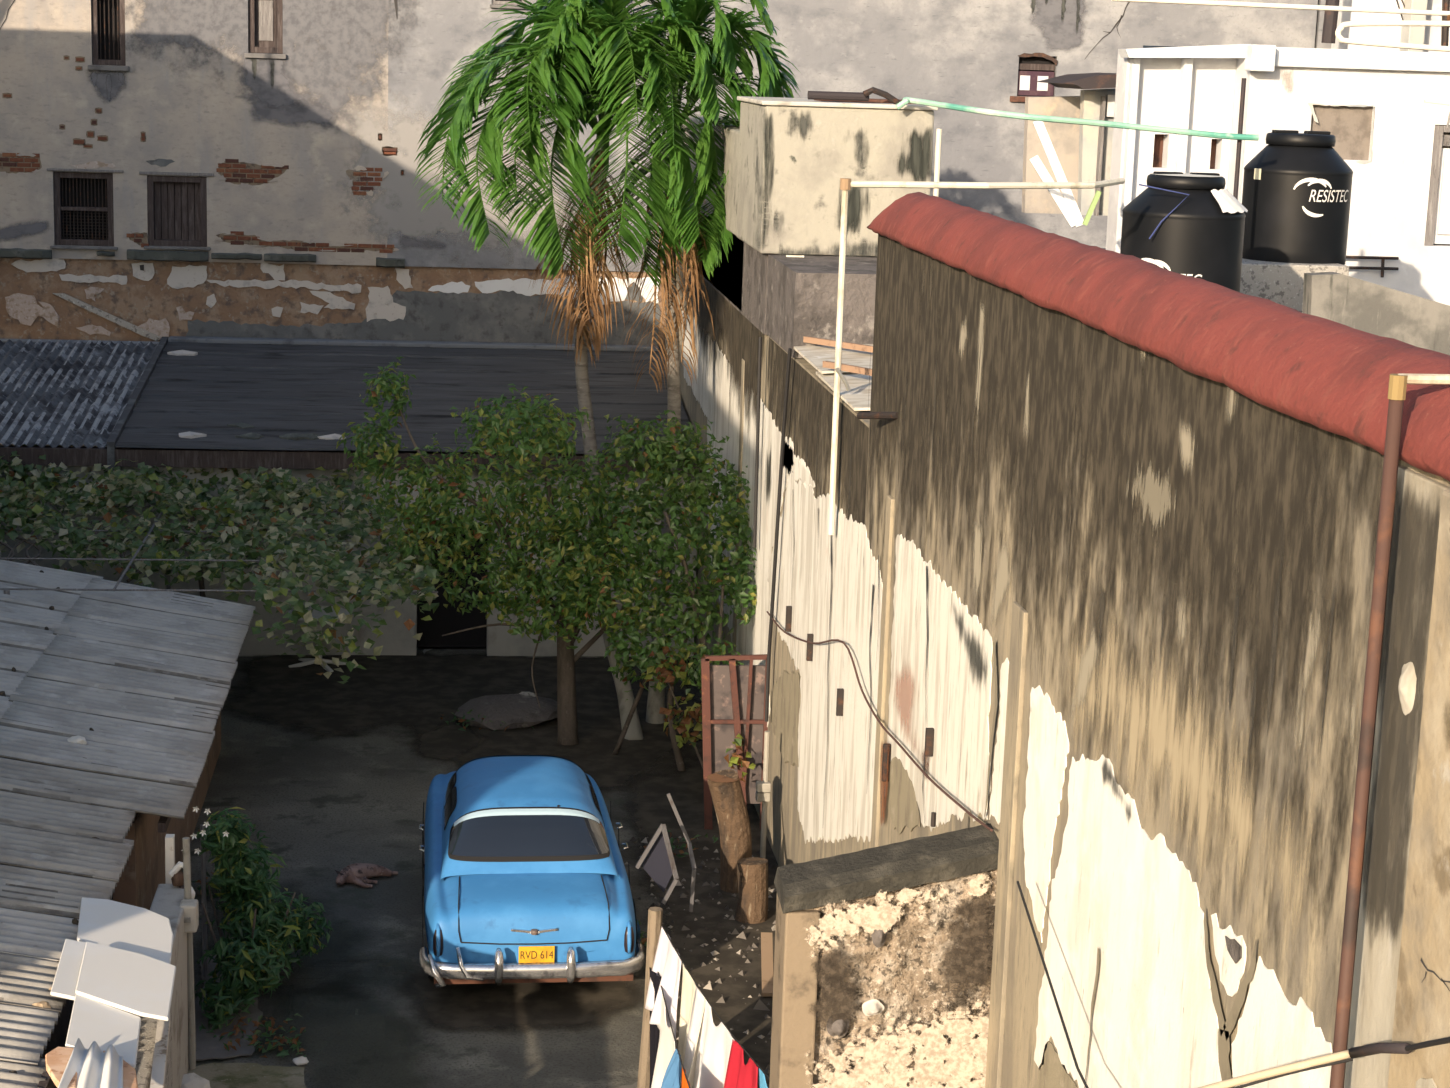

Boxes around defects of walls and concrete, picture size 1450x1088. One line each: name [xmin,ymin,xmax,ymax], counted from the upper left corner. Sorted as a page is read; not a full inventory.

flaking render [216,159,289,189]
leakage [125,0,576,248]
leakage [756,116,778,248]
leakage [791,114,811,138]
leakage [856,132,868,166]
leakage [898,130,934,182]
flaking render [5,231,578,340]
peeling [598,277,660,305]
peeling [682,312,1009,844]
leakage [675,188,1439,937]
spalling [939,884,995,1012]
peeling [1023,685,1332,1088]